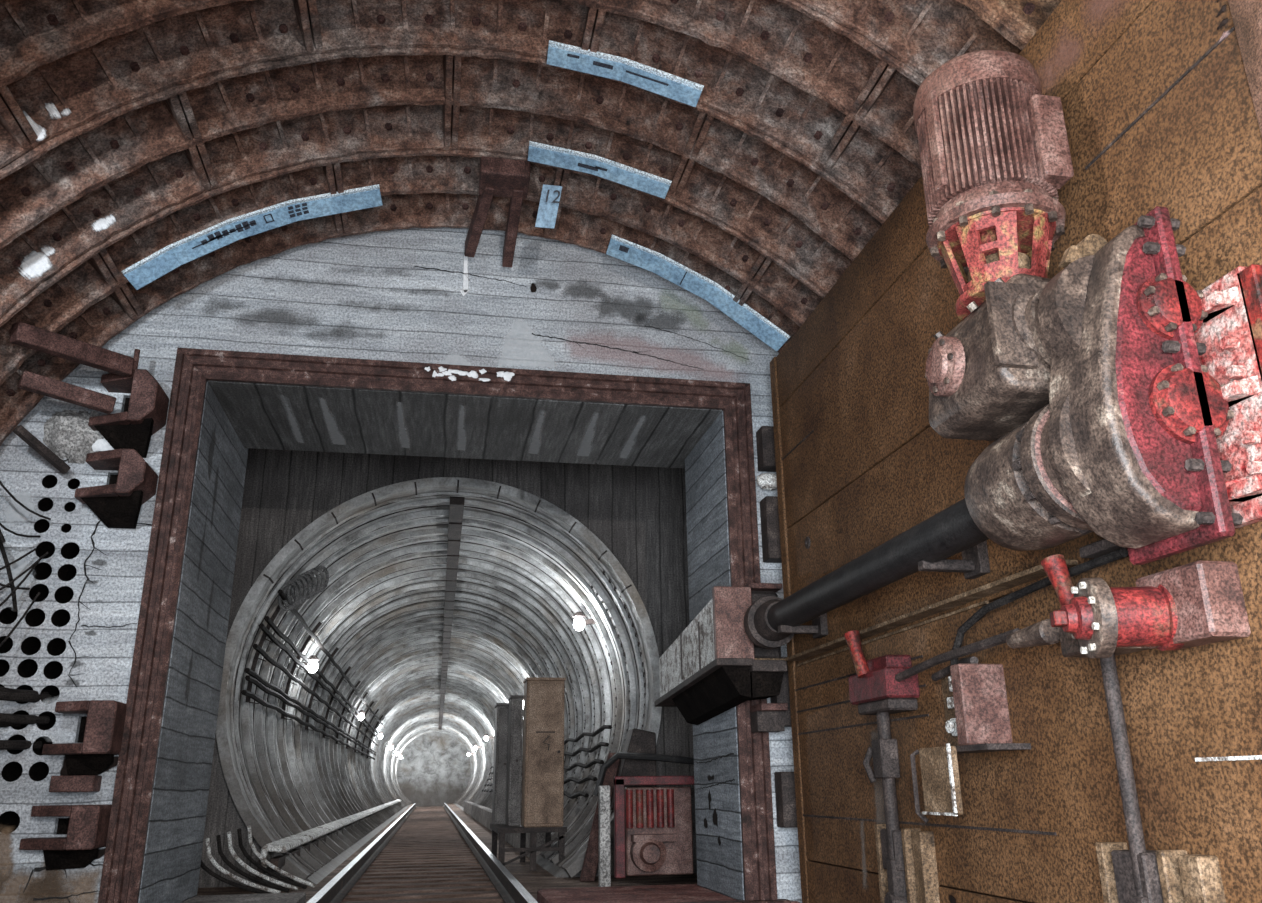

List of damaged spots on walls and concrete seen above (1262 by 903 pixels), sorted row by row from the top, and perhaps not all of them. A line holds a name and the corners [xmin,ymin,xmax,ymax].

damp [460,256,470,296]
damp [248,312,297,324]